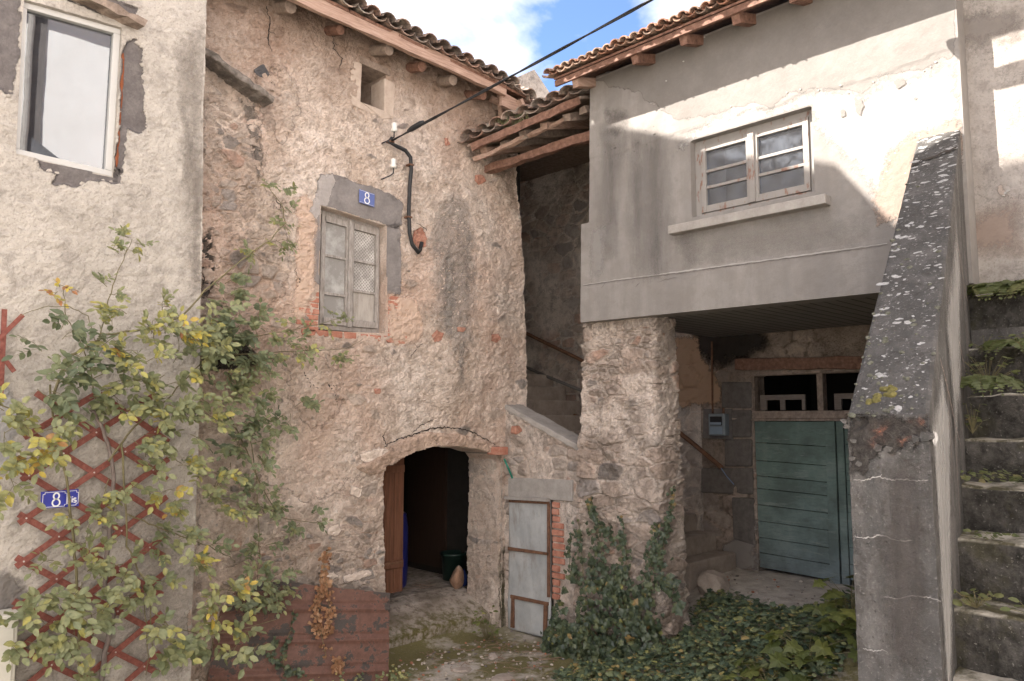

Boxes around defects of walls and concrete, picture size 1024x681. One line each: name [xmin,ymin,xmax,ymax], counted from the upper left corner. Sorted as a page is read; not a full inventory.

spalling [0,0,22,97]
spalling [38,39,152,187]
peeling [596,0,963,226]
crack [382,419,496,447]
spalling [840,413,935,477]
crack [859,474,927,482]